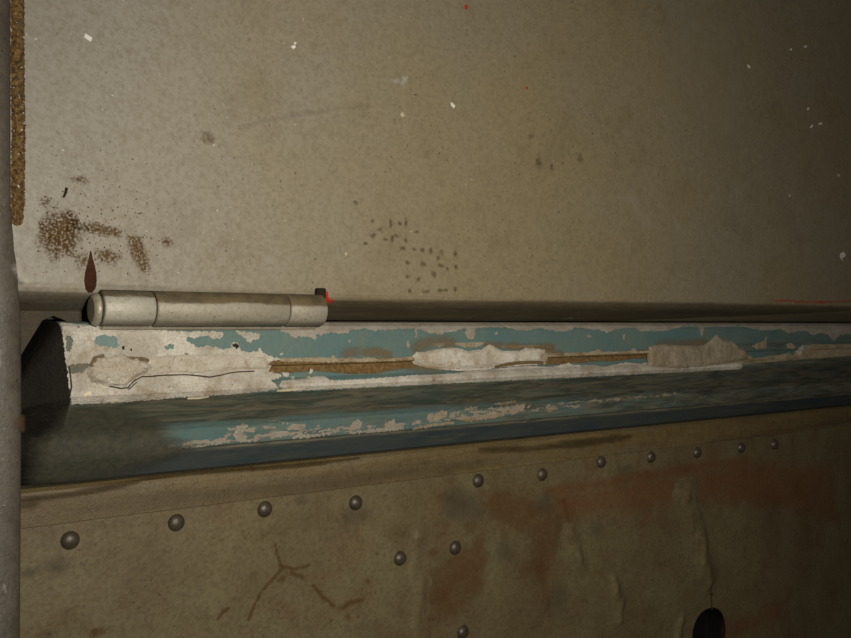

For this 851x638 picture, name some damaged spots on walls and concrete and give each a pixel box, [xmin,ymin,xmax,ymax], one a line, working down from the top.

rust [10,0,26,226]
rust [36,169,171,275]
crack [90,354,105,367]
crack [110,356,254,390]
peeling [60,322,851,405]
peeling [172,392,681,449]